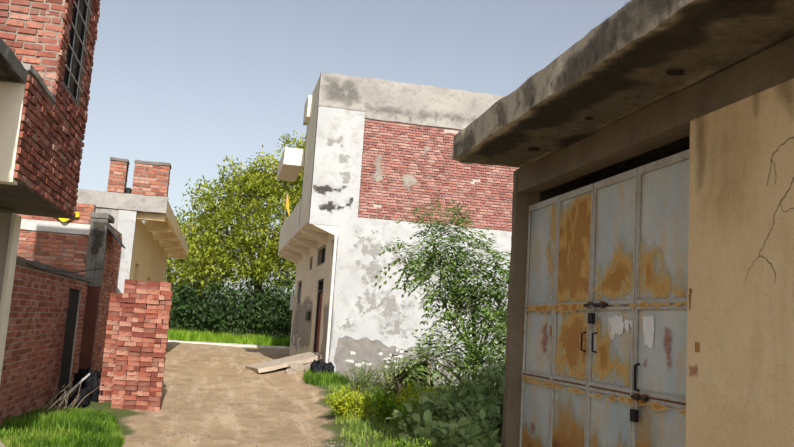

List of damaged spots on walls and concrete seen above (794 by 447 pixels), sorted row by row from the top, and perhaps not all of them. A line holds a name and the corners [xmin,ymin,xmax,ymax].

damp [328,79,358,104]
damp [453,0,794,167]
mould [313,137,353,212]
flaking render [358,118,518,232]
crack [744,137,794,286]
spalling [334,231,503,386]
corrosion [522,193,692,447]